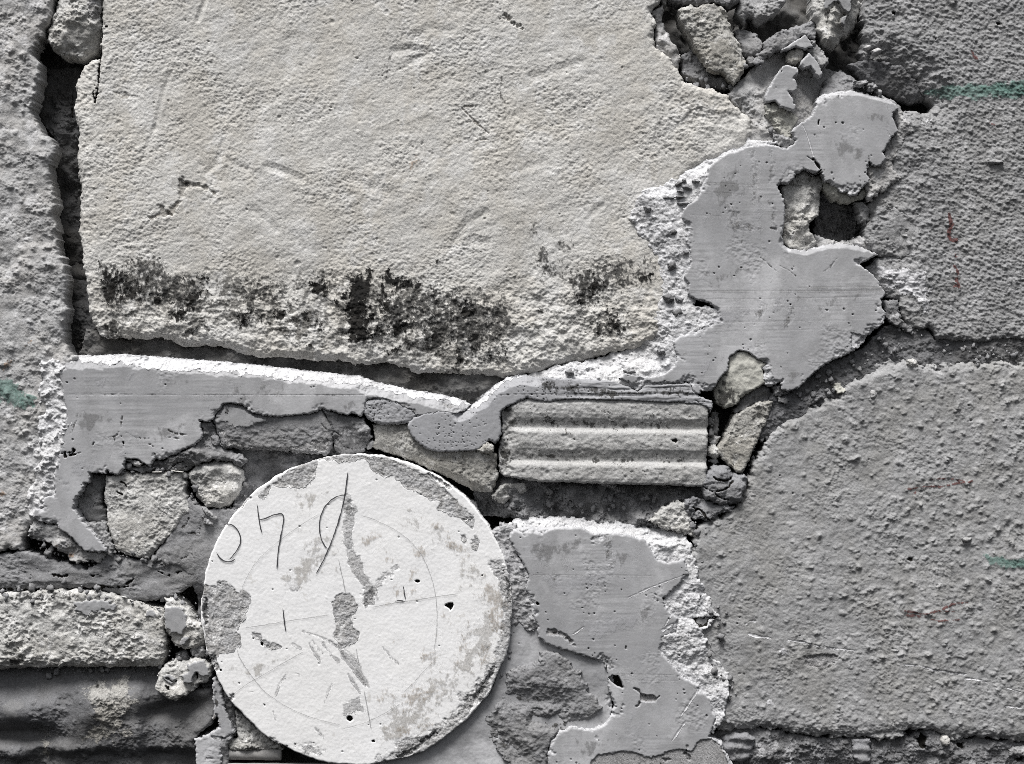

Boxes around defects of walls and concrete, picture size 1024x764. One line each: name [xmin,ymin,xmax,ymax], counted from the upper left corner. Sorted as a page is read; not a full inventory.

crack [42,13,108,139]
peeling [763,35,822,112]
spalling [853,80,882,97]
water stain [88,253,517,374]
spalling [26,137,778,519]
water stain [522,222,657,344]
spalling [851,333,863,351]
spalling [201,505,218,527]
peeling [221,430,480,550]
spalling [375,515,729,764]